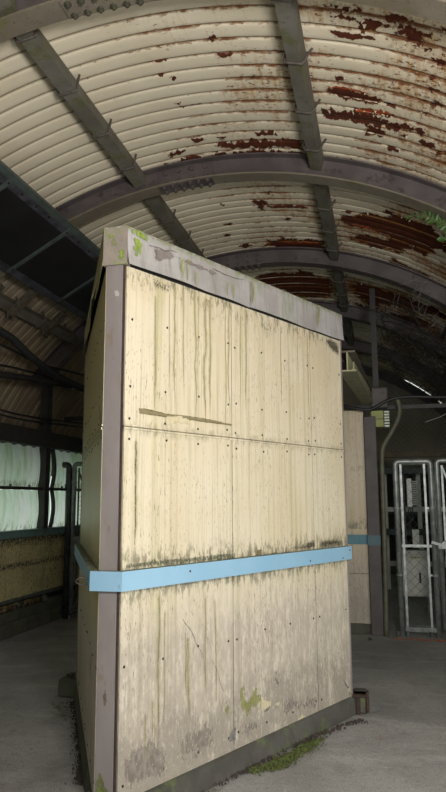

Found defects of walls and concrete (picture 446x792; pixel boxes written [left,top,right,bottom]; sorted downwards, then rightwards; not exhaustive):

rust [330,4,446,66]
rust [321,75,446,155]
rust [164,130,305,165]
rust [250,191,308,210]
rust [264,236,325,249]
rust [335,209,446,277]
rust [254,270,334,298]
peeling [139,408,232,426]
damp [273,539,342,554]
damp [126,554,233,568]
peeling [226,685,334,742]